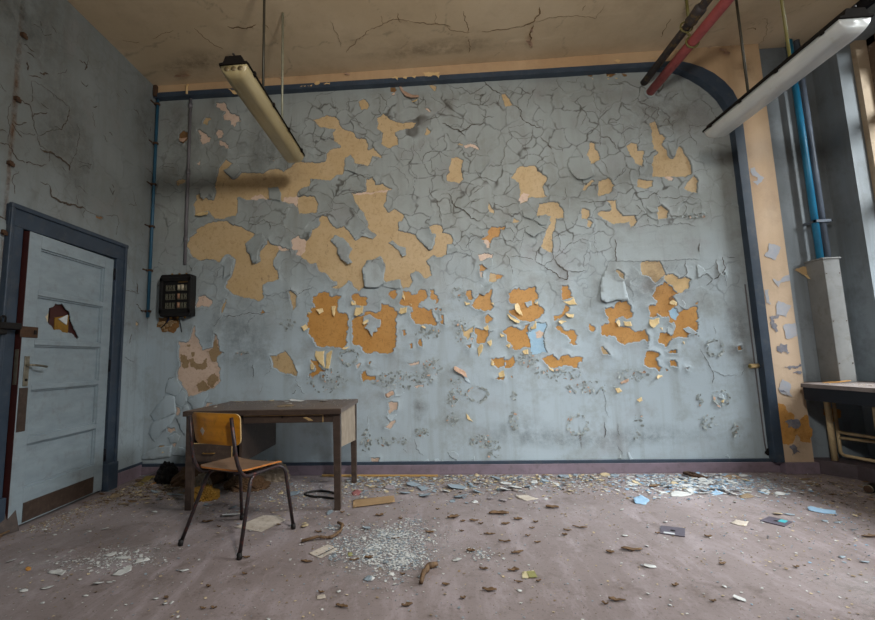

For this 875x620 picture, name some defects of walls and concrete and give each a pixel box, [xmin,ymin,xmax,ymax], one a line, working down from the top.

crack [332,6,603,52]
peeling [391,72,440,102]
flaking render [179,103,241,149]
peeling [447,157,463,183]
peeling [626,121,698,193]
peeling [581,178,637,227]
peeling [187,114,458,381]
peeling [461,166,582,380]
flaking render [157,317,179,333]
peeling [589,261,705,379]
flaking render [178,326,222,396]
peeling [778,403,813,445]